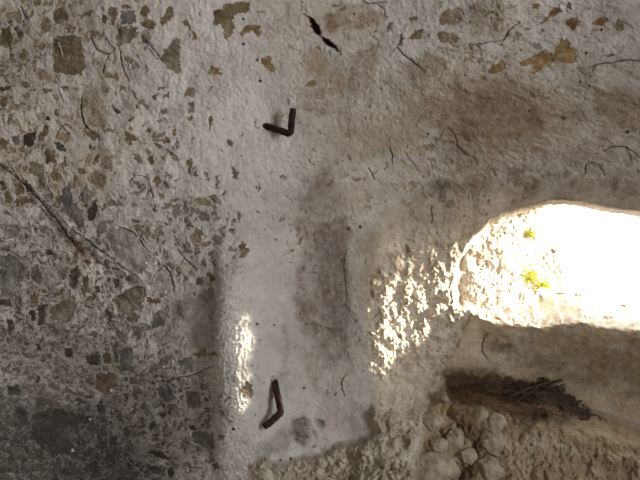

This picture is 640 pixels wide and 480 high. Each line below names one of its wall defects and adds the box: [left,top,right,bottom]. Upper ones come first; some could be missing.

peeling [0,19,28,62]
peeling [52,35,86,75]
peeling [102,5,173,47]
peeling [161,36,183,74]
peeling [213,2,262,45]
crack [303,13,342,56]
spalling [519,37,577,74]
peeling [0,109,59,150]
peeling [123,132,154,165]
peeling [0,141,106,237]
peeling [152,175,219,222]
crack [0,161,196,299]